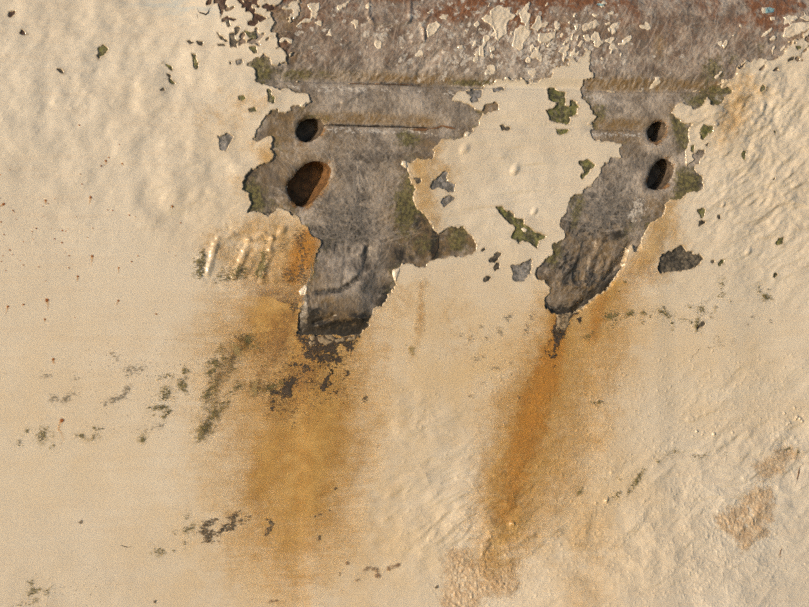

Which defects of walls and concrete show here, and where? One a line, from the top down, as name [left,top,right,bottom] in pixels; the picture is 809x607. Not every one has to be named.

peeling [206,0,809,337]
water stain [156,368,189,403]
rust [243,225,359,559]
water stain [251,335,367,432]
rust [488,281,625,556]